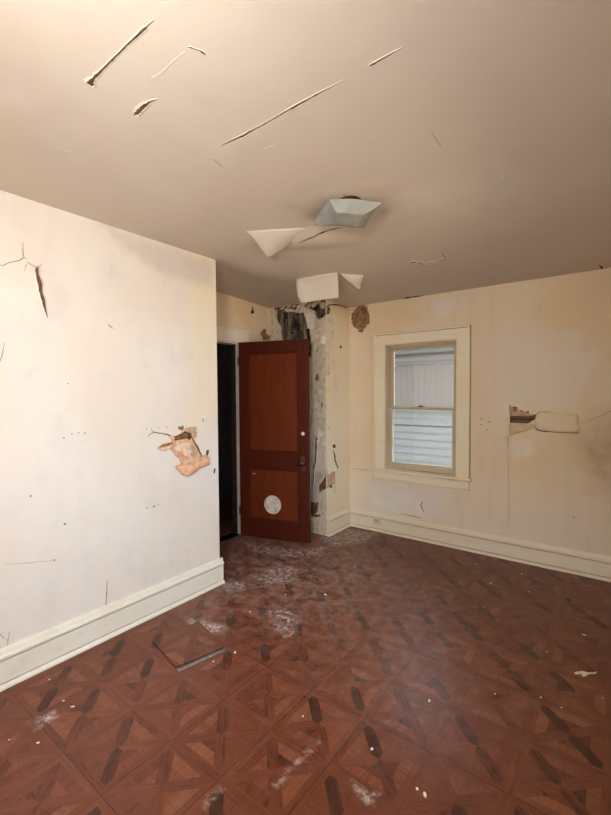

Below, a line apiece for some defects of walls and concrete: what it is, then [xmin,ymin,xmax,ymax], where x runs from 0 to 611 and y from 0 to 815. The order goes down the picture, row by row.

crack [151,46,206,79]
crack [0,242,42,272]
spalling [273,300,370,517]
spalling [146,425,216,476]
spalling [506,405,580,523]